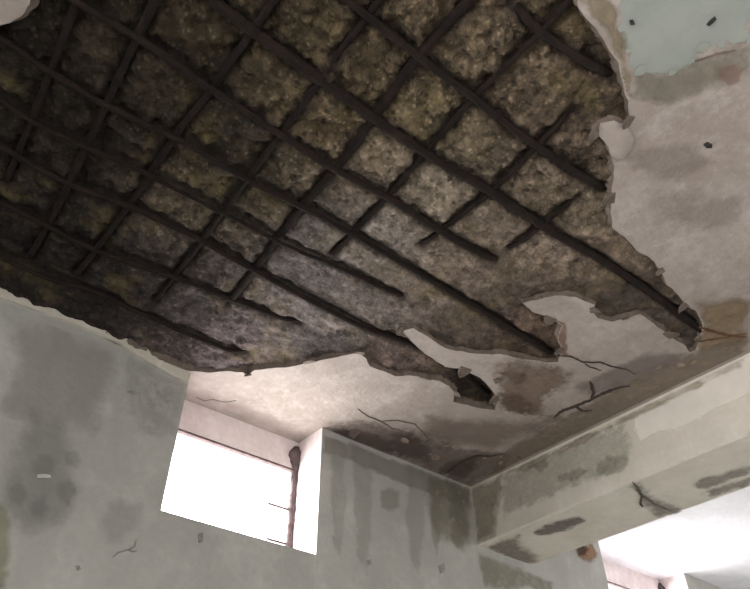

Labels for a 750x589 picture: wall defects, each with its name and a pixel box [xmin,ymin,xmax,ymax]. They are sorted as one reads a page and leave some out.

peeling [618,0,750,76]
spalling [0,0,703,419]
corrosion [698,300,748,349]
crack [553,355,636,419]
crack [358,409,431,444]
water stain [333,341,750,547]
crack [632,482,651,507]